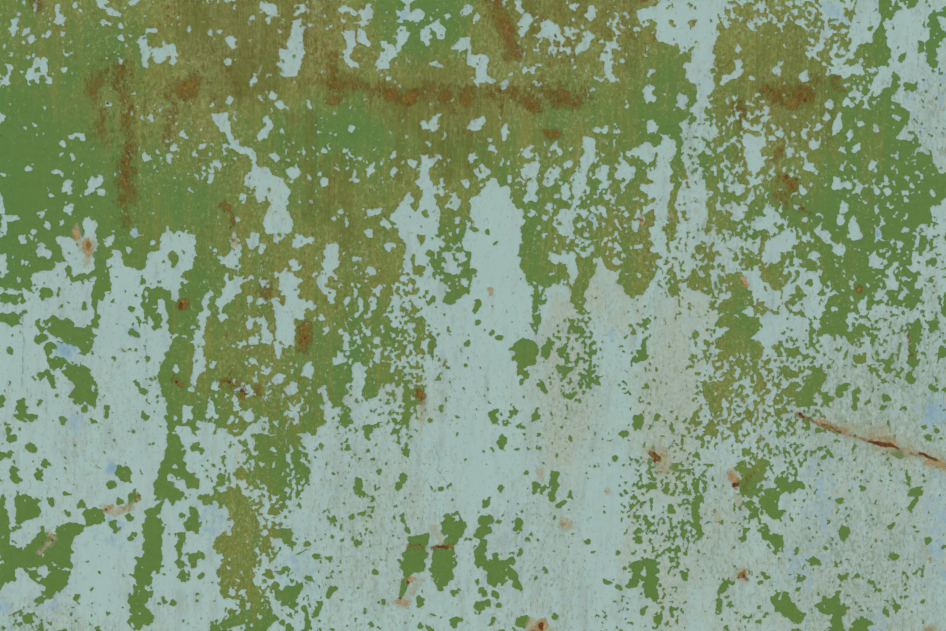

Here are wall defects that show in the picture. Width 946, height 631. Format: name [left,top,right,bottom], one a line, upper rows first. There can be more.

peeling [8,4,67,44]
peeling [96,0,139,26]
peeling [0,63,13,87]
peeling [25,57,52,85]
corrosion [326,52,472,107]
corrosion [489,82,592,114]
peeling [59,133,86,148]
peeling [51,169,106,216]
peeling [831,159,892,196]
corrosion [796,412,946,468]
corrosion [526,618,553,631]